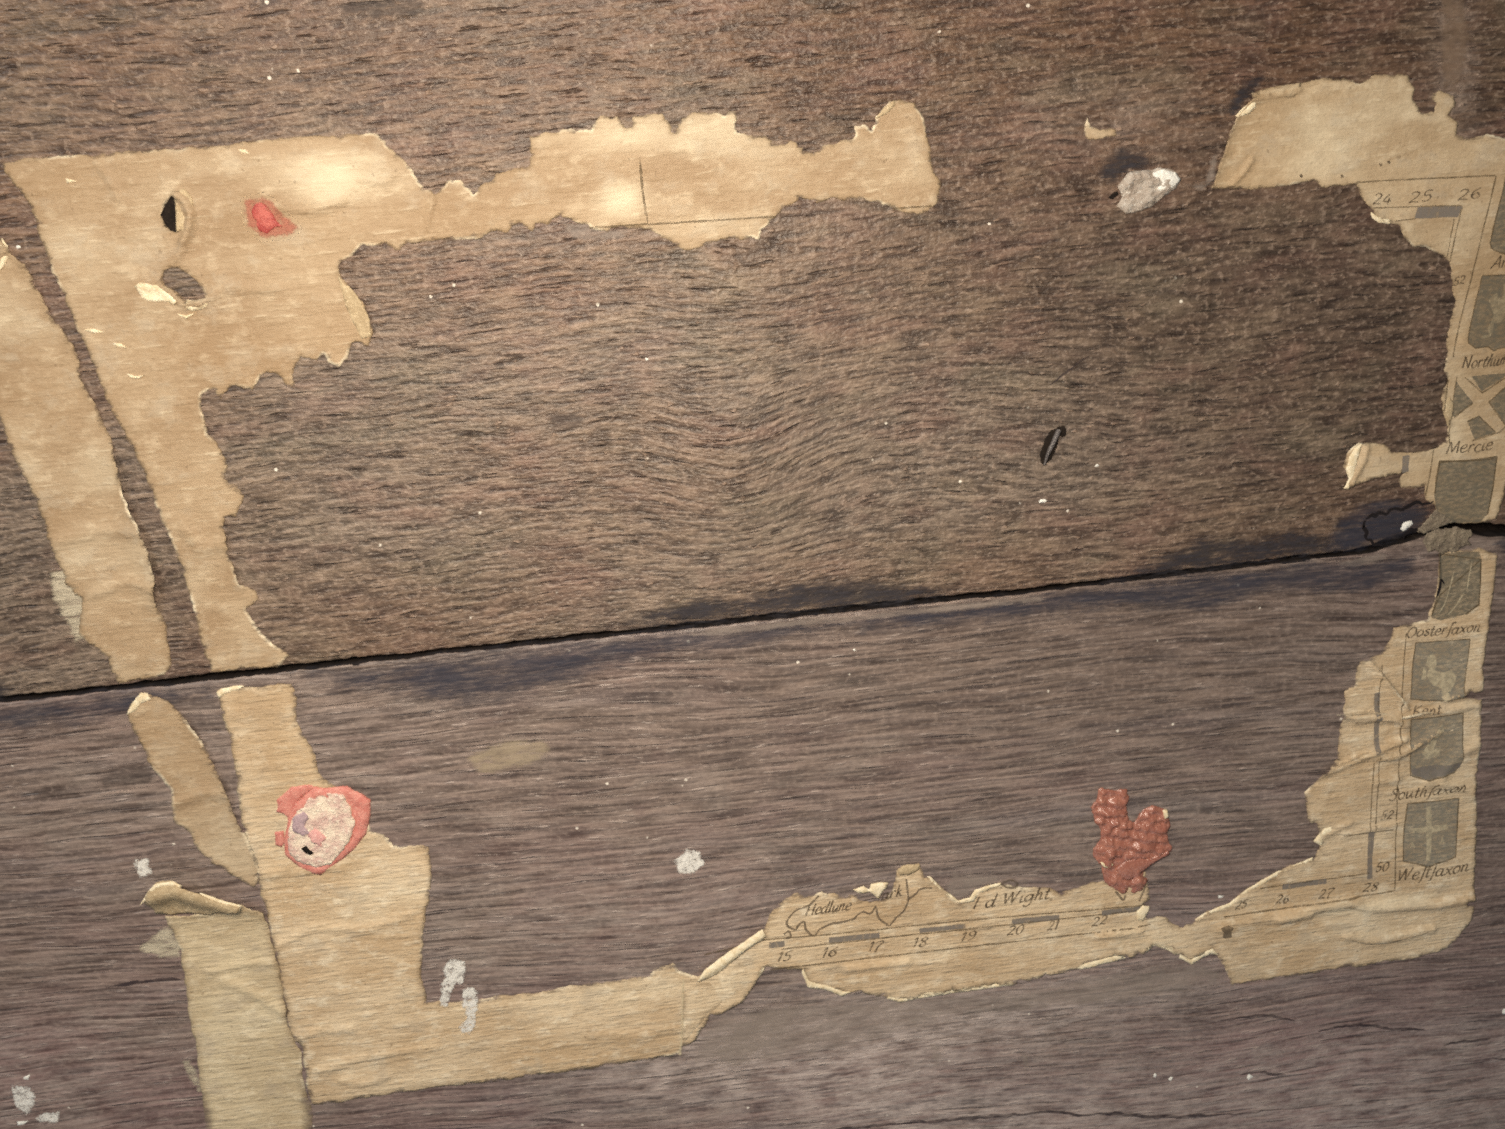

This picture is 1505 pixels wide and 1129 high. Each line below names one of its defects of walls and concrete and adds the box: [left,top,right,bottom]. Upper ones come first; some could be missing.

peeling [1084,117,1117,140]
spalling [1040,426,1061,466]
crack [840,1071,1286,1129]